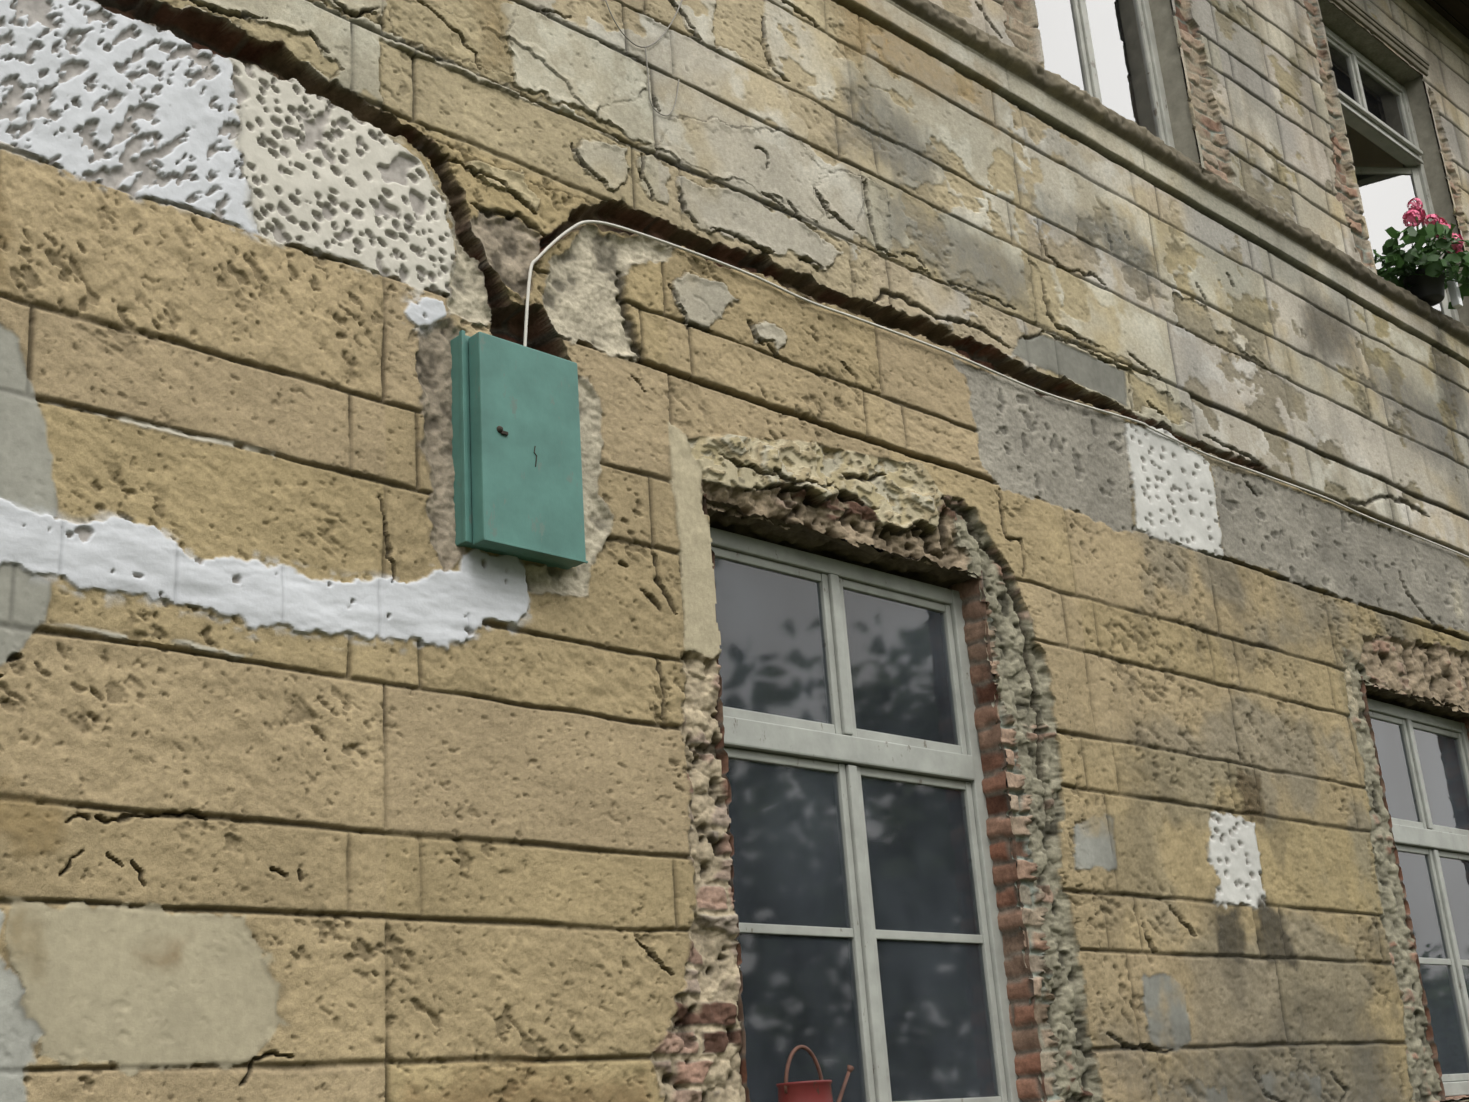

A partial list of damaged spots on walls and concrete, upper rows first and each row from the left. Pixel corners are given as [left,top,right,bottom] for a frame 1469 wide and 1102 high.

crack [189,0,261,20]
crack [309,0,379,54]
crack [416,0,482,70]
crack [446,158,546,241]
peeling [159,0,994,597]
crack [615,271,646,386]
crack [570,142,824,269]
crack [754,146,1017,349]
crack [1046,323,1164,415]
spalling [651,422,1106,1102]
crack [65,808,208,886]
spalling [1342,634,1469,1102]